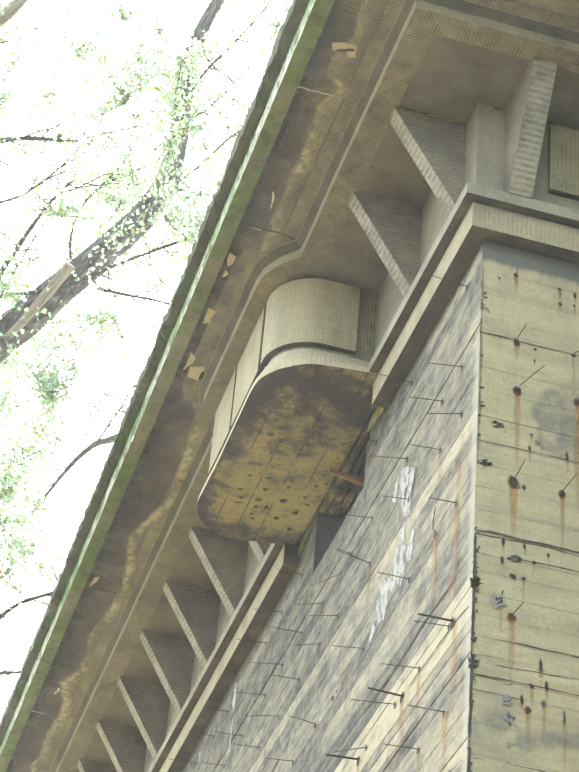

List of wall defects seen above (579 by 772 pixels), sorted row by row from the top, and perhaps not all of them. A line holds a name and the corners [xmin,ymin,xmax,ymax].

leakage [6,0,350,772]
rust [513,386,522,419]
rust [508,475,526,515]
rust [507,613,516,642]
spalling [501,694,516,724]